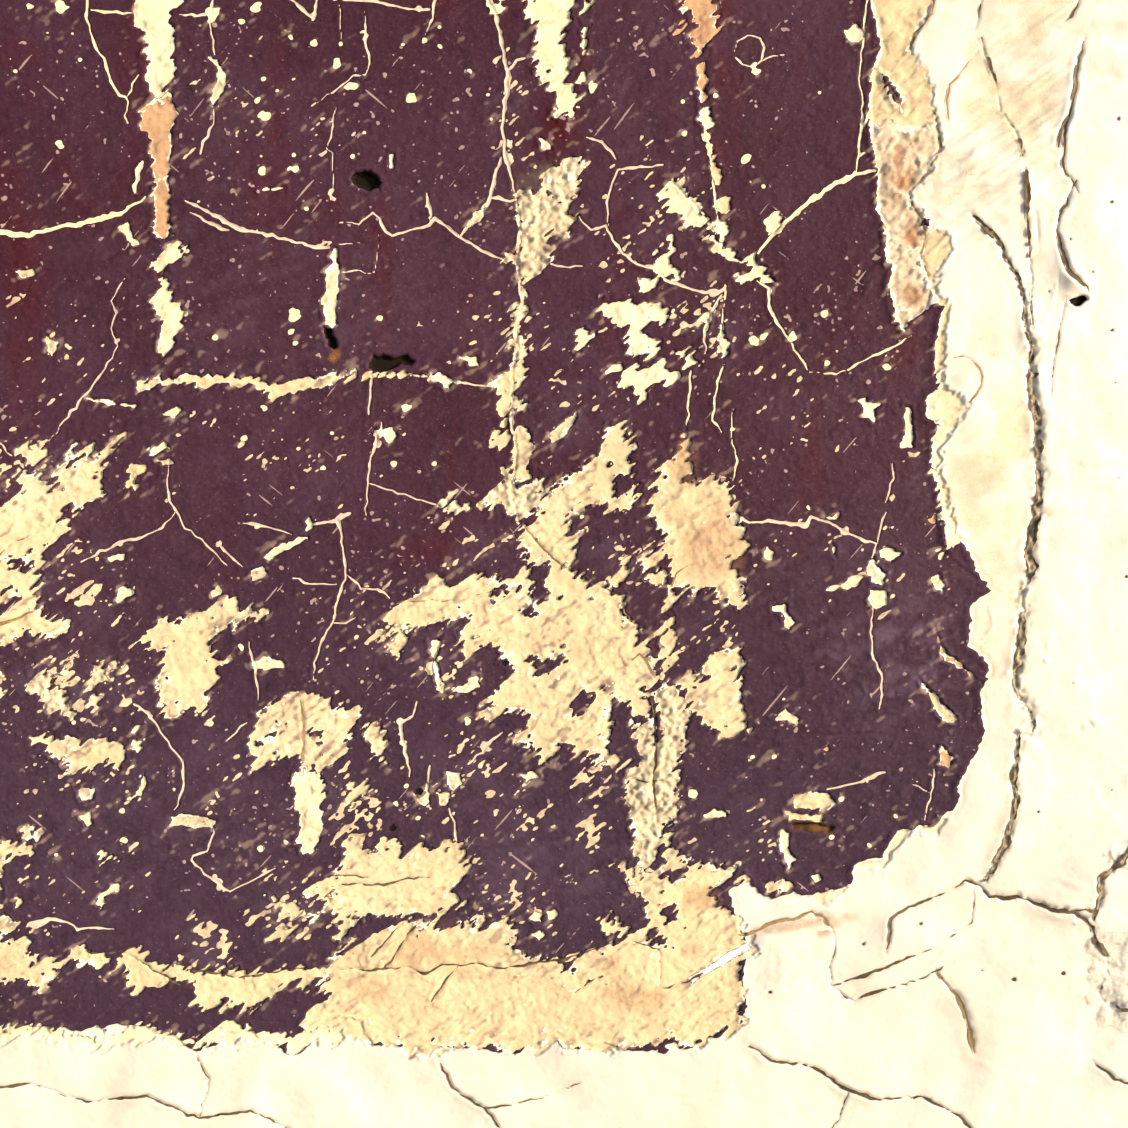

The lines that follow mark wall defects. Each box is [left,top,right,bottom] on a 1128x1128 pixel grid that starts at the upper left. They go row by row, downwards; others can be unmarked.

crack [0,161,146,238]
crack [85,0,139,124]
peeling [133,0,196,357]
crack [185,0,526,361]
crack [243,372,516,767]
peeling [0,114,836,1060]
peeling [494,0,594,118]
crack [579,118,739,479]
peeling [673,0,725,130]
peeling [826,543,905,620]
peeling [858,398,881,422]
crack [734,0,1128,1054]